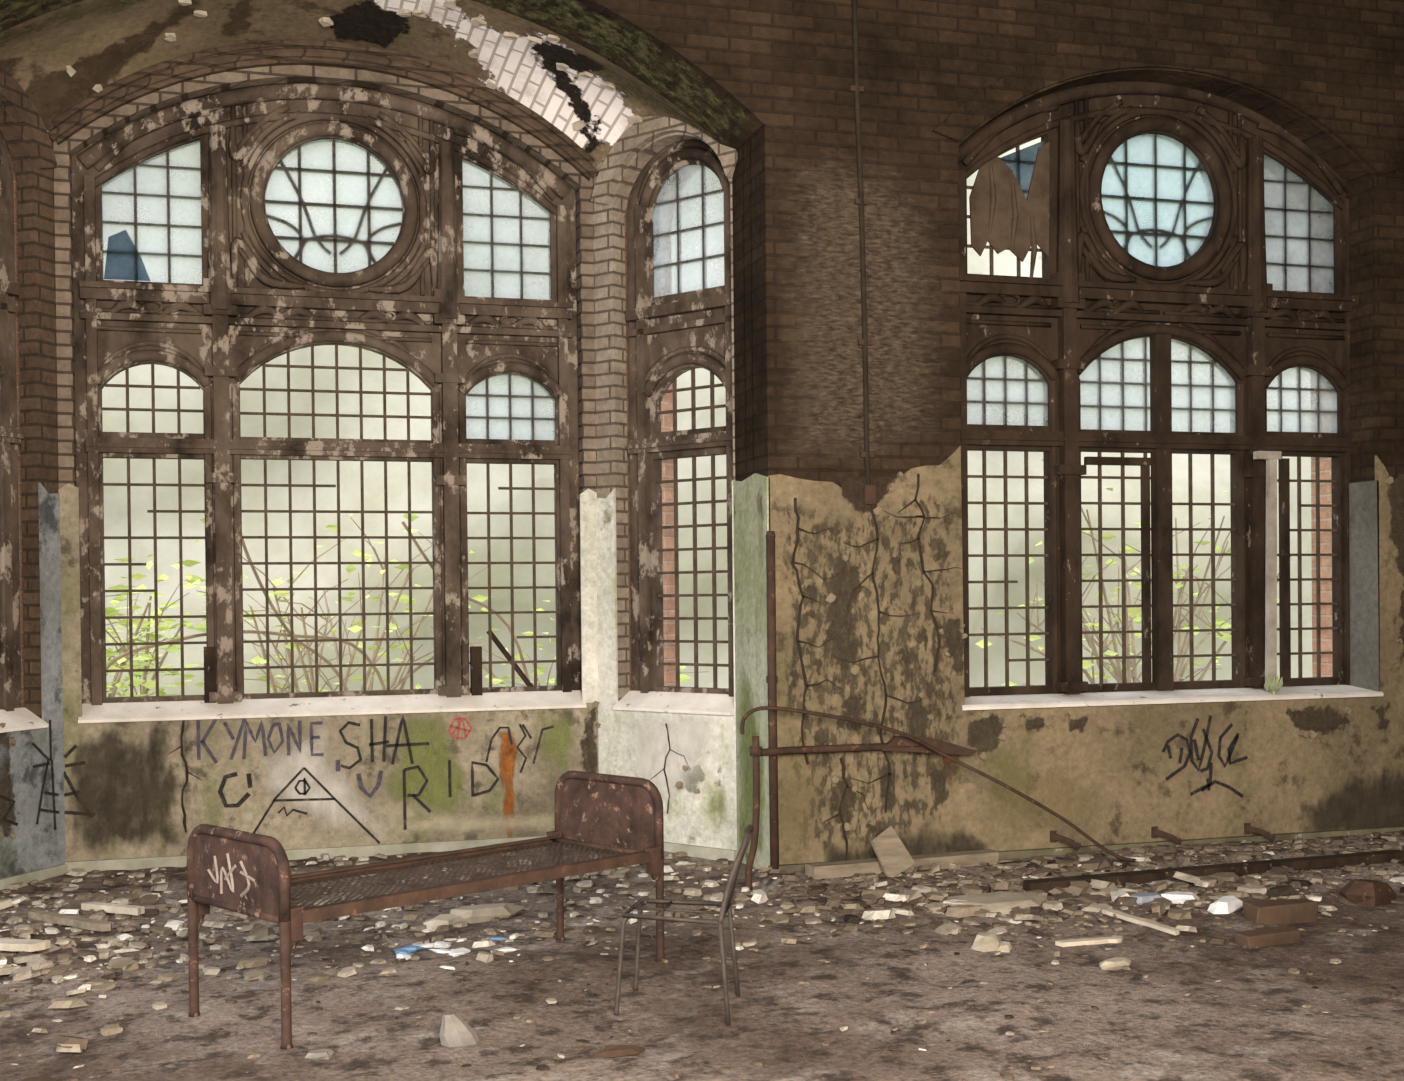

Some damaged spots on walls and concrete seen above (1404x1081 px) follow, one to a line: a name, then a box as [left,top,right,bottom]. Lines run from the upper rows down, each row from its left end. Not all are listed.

flaking render [319,0,642,153]
flaking render [839,471,903,515]
spalling [968,710,1044,760]
spalling [1067,714,1088,732]
spalling [1286,705,1351,739]
spalling [1371,703,1390,730]
crack [650,723,690,814]
leakage [1304,771,1404,832]
leakage [829,848,874,862]
leakage [900,833,984,855]